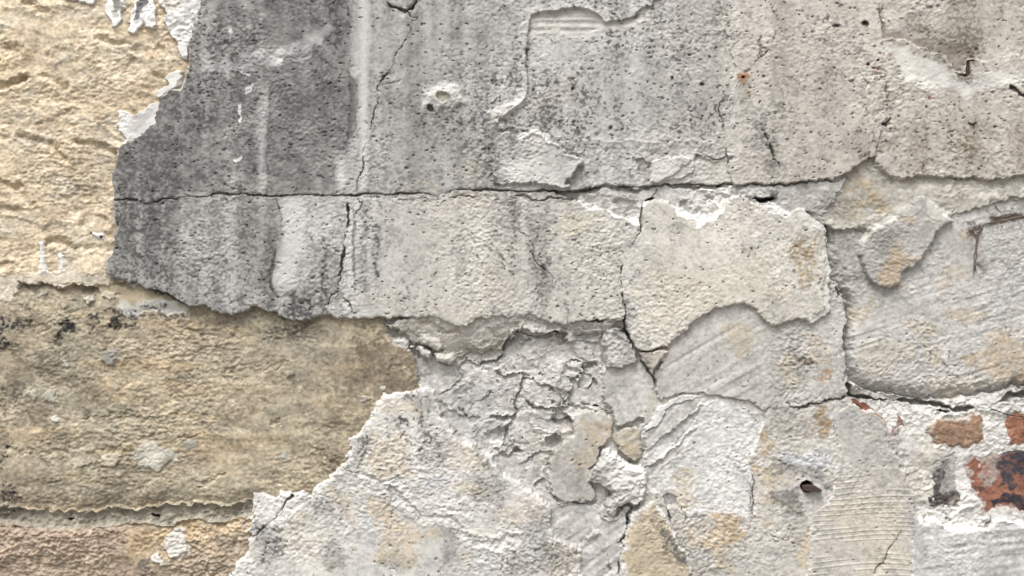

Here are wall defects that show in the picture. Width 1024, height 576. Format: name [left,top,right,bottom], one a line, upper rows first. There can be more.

peeling [67,0,201,149]
flaking render [95,199,189,319]
damp [112,123,191,282]
damp [227,0,383,321]
crack [113,0,833,386]
flaking render [486,92,530,129]
flaking render [524,1,654,45]
corrosion [736,69,752,99]
crack [549,383,615,417]
crack [785,283,1024,413]
crack [553,496,597,505]